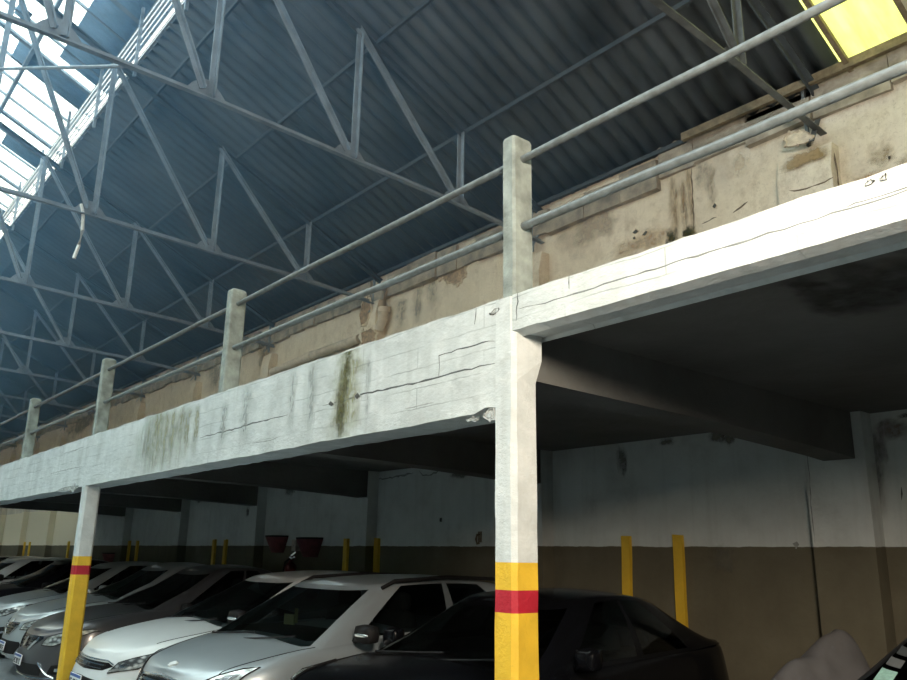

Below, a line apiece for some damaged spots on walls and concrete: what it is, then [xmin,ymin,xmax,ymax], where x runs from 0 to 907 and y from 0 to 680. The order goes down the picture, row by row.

crack [691,169,748,228]
crack [789,153,839,192]
crack [516,187,907,319]
peeling [358,295,378,346]
crack [323,314,495,408]
water stain [334,361,358,429]
water stain [145,411,199,455]